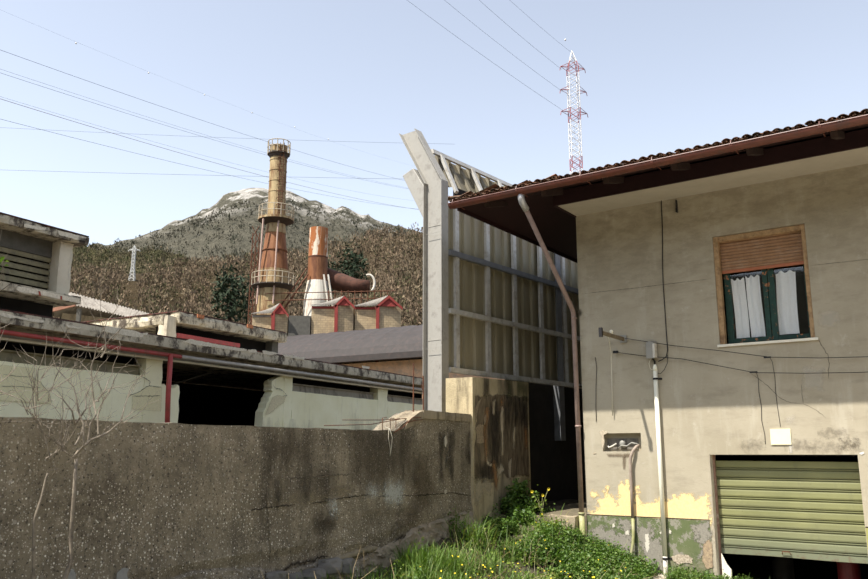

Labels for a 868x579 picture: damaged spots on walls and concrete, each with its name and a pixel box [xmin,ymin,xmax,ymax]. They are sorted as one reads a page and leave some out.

peeling [588,479,714,573]